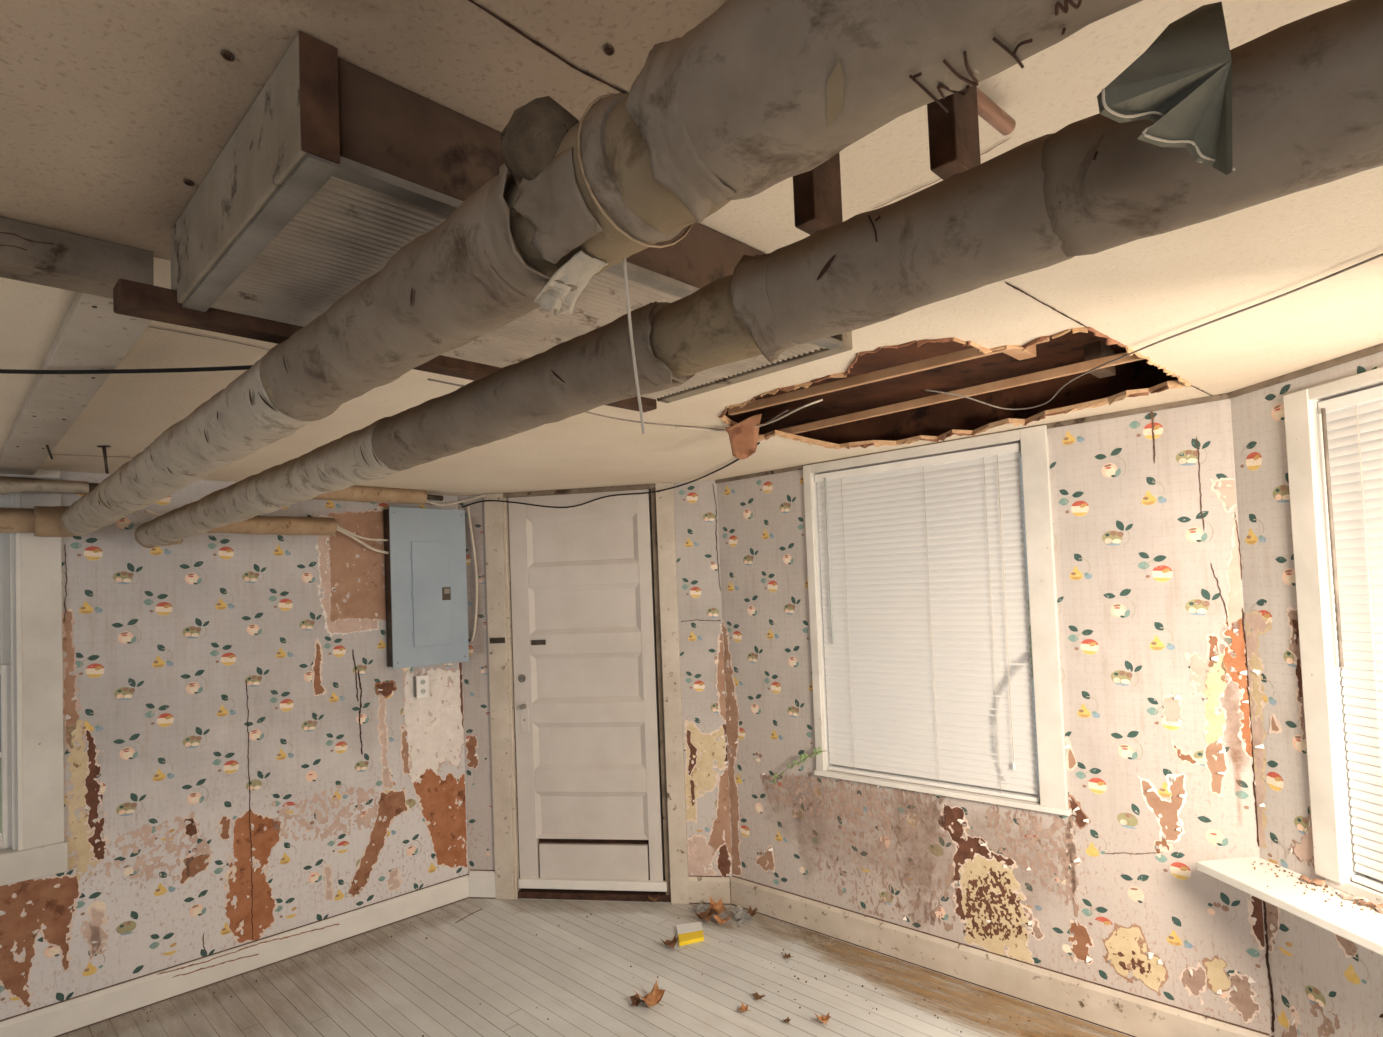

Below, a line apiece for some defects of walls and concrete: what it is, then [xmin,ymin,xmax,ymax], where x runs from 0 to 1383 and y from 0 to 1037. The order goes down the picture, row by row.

crack [468,0,629,94]
spalling [718,327,1191,459]
spalling [375,680,397,698]
peeling [714,630,738,776]
peeling [1211,651,1260,703]
peeling [686,729,701,806]
peeling [76,805,139,878]
flaking render [762,772,1055,941]
flaking render [1086,943,1164,981]
crack [1263,901,1275,1032]